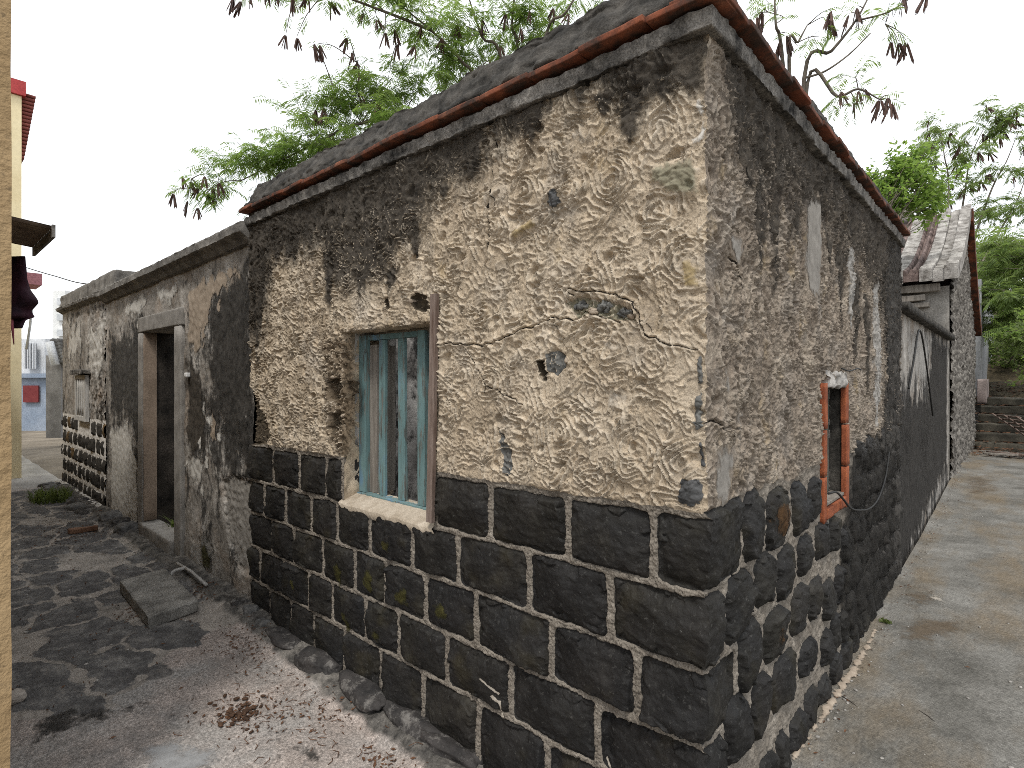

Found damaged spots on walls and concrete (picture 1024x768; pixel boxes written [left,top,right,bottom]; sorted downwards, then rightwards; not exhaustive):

damp [98,334,138,441]
spalling [252,397,271,445]
damp [185,126,484,474]
spalling [532,351,568,376]
crack [438,288,698,405]
spalling [567,298,635,320]
damp [724,56,947,636]